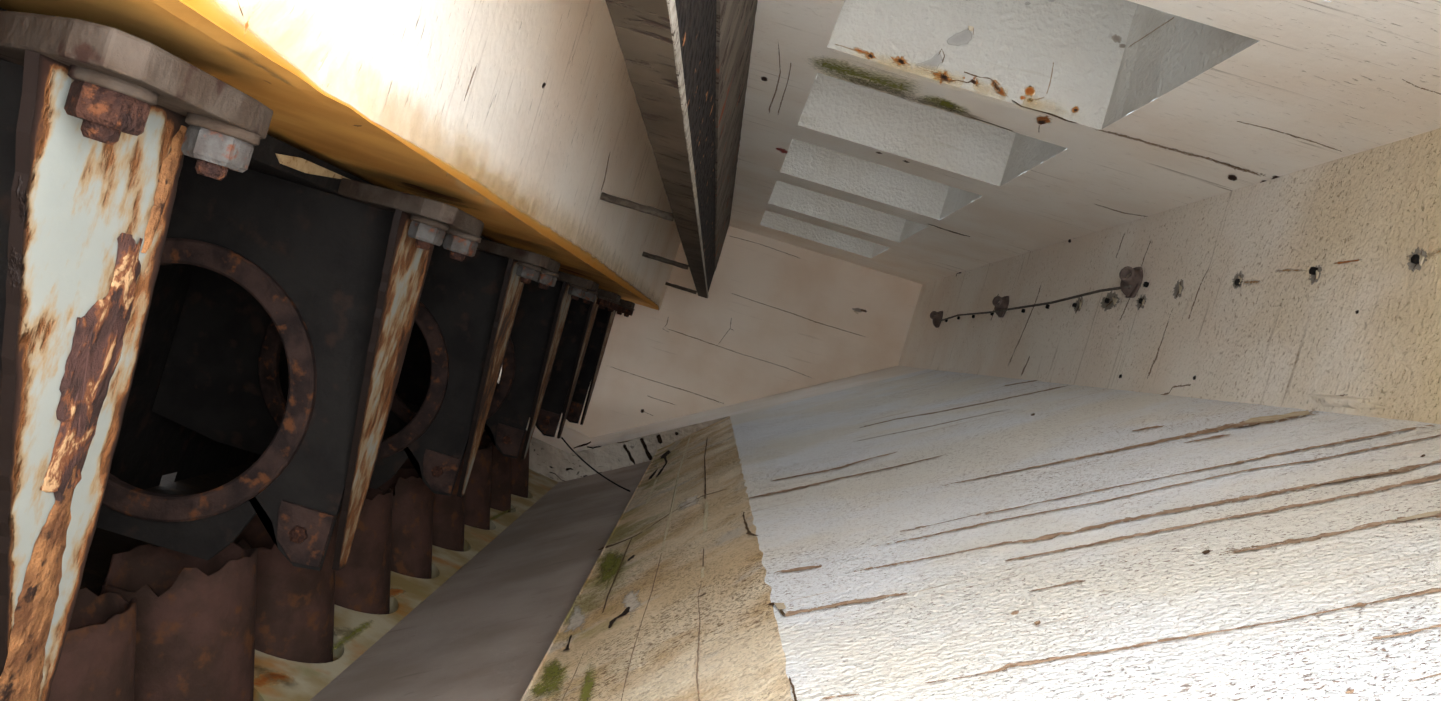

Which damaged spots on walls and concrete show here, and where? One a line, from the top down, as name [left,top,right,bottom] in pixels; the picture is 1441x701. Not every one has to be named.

corrosion [141,125,187,254]